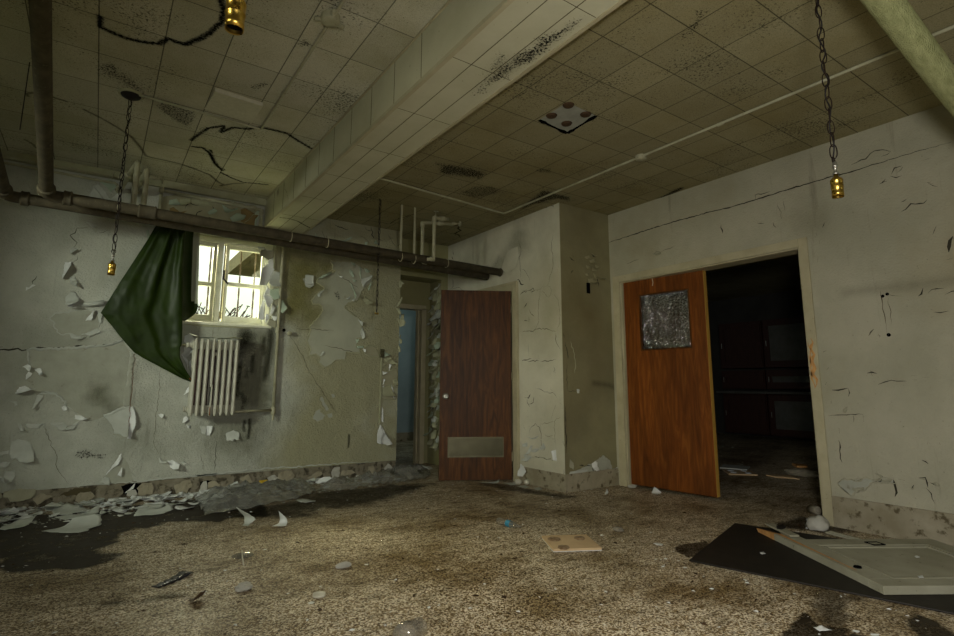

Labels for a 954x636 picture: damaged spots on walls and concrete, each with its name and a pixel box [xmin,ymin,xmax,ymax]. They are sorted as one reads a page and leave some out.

crack [611,142,951,242]
crack [933,227,953,260]
crack [0,339,123,351]
peeling [49,247,103,339]
peeling [181,246,287,371]
peeling [301,260,406,401]
peeling [423,283,441,451]
crack [518,242,577,453]
peeling [0,439,70,522]
peeling [61,453,357,517]
peeling [236,488,282,526]
peeling [377,425,392,445]